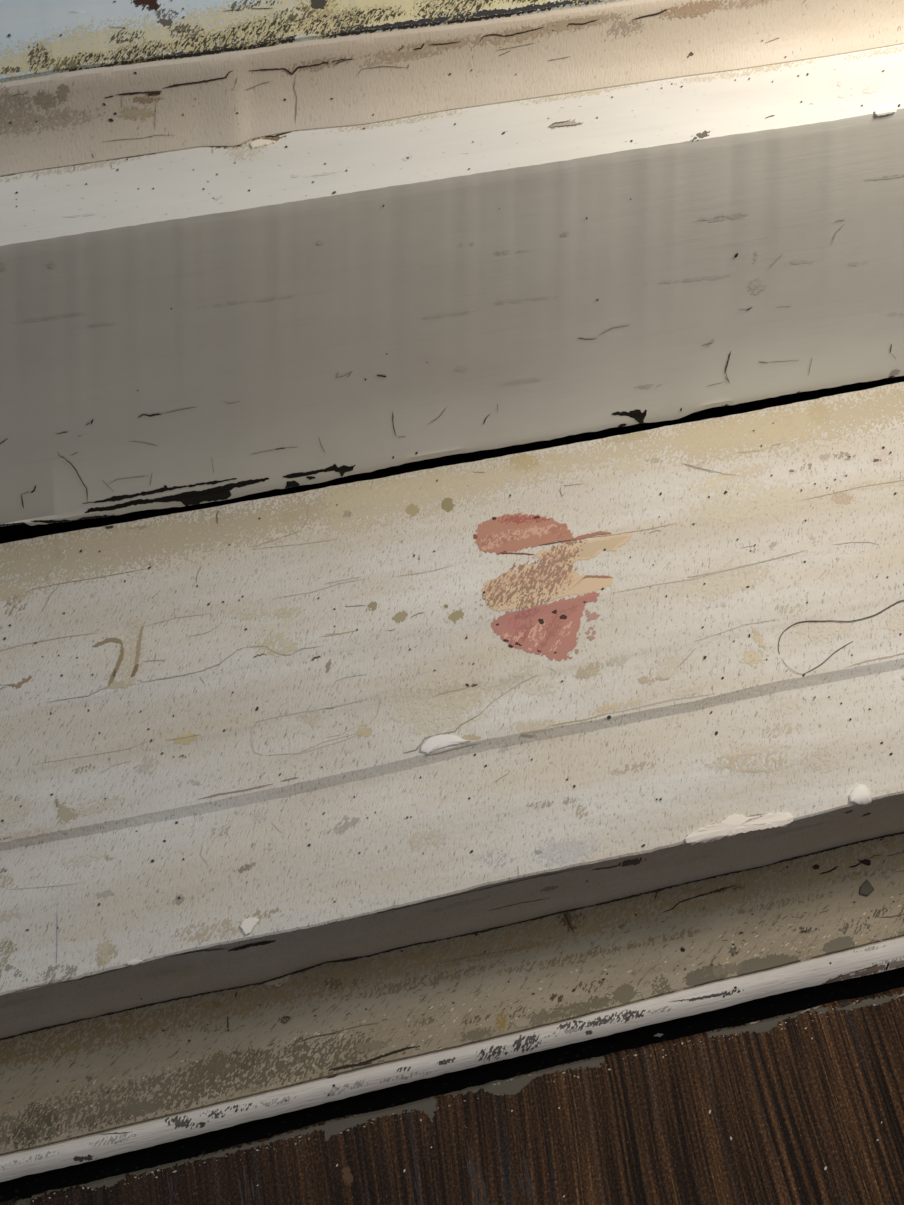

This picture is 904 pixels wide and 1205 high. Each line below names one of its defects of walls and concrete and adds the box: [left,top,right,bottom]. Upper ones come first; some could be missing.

crack [50,20,596,170]
leakage [0,0,779,138]
peeling [0,464,355,529]
peeling [476,513,632,661]
spalling [476,1018,545,1062]
spalling [557,989,653,1035]
peeling [669,980,744,1002]
spalling [17,1056,605,1205]